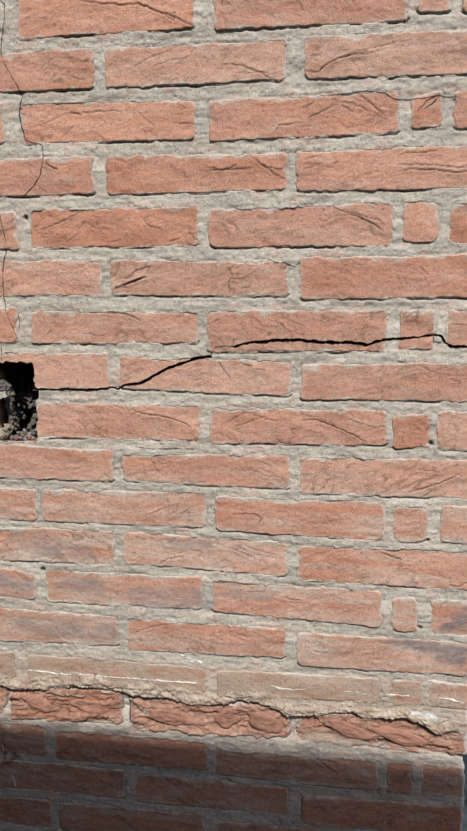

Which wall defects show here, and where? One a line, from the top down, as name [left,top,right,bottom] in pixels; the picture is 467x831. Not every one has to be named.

crack [0,0,44,362]
crack [34,334,467,391]
spalling [0,671,467,755]